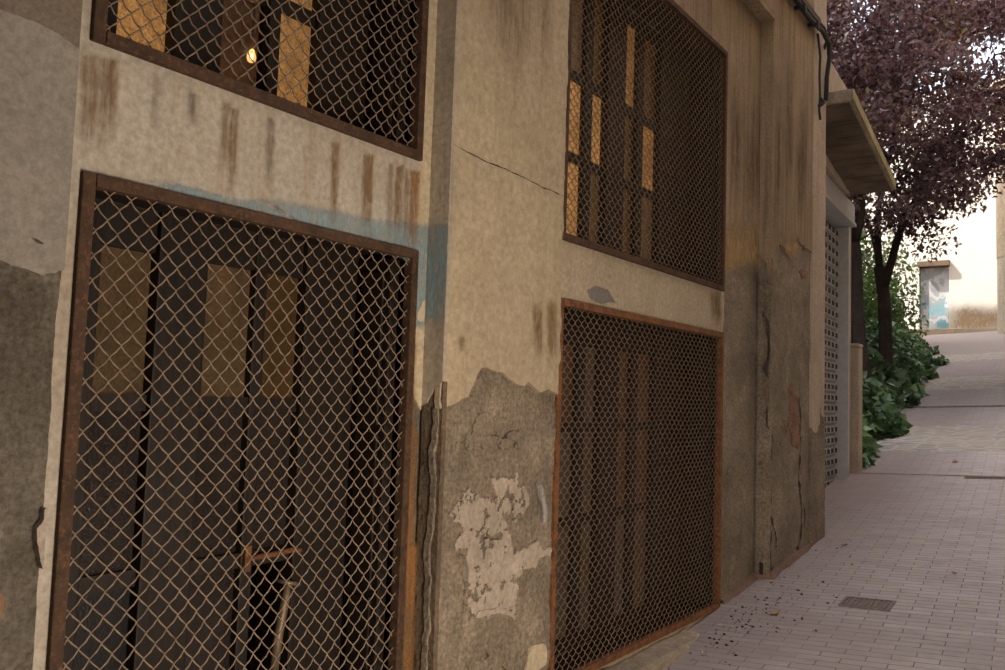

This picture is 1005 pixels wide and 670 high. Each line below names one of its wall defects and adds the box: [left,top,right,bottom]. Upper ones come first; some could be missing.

crack [454,144,564,197]
spalling [0,262,62,670]
spalling [402,368,556,670]
spalling [720,239,825,602]